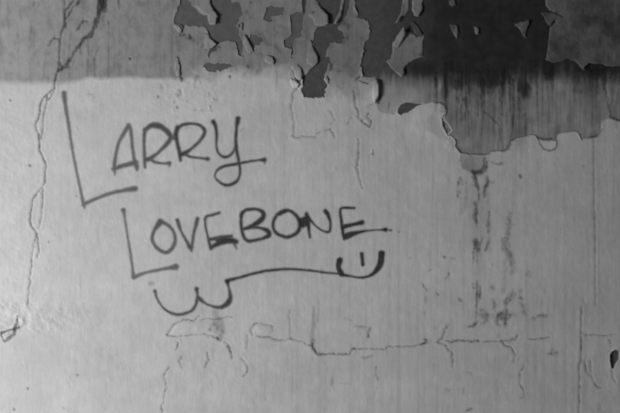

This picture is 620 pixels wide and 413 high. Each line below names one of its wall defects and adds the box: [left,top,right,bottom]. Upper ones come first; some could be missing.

crack [53,0,106,82]
peeling [171,0,266,75]
peeling [261,0,620,157]
damp [429,0,557,88]
spalling [608,348,620,371]